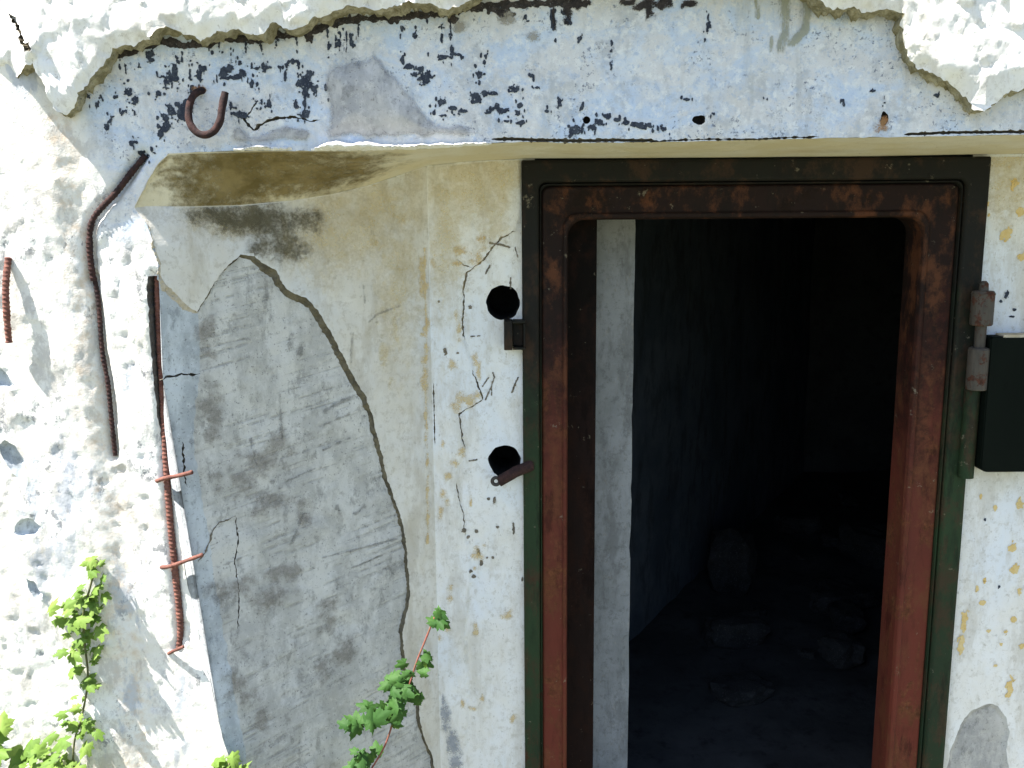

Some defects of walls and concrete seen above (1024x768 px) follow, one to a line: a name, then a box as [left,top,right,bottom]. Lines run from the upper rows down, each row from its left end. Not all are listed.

crack [243,102,317,131]
spalling [2,257,13,343]
crack [458,231,514,337]
spalling [0,368,17,391]
crack [432,370,483,446]
spalling [0,440,27,487]
spalling [14,517,43,539]
spalling [145,222,434,768]
spalling [26,579,43,600]
crack [198,516,240,629]
peeling [957,577,1001,656]
spalling [947,675,1016,768]